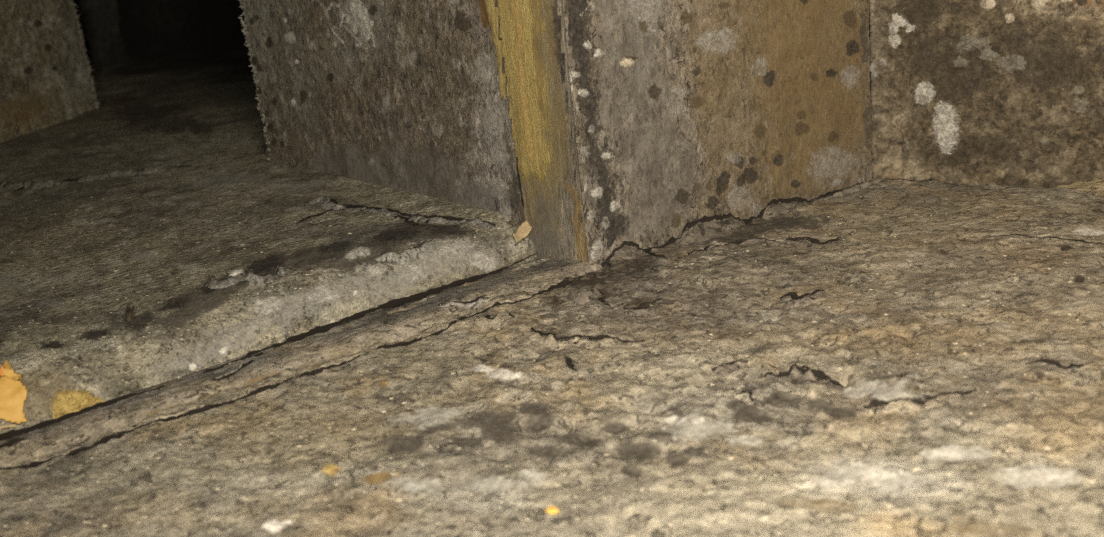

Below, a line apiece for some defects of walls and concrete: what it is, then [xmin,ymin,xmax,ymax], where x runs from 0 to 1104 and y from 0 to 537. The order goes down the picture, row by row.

water stain [698,29,734,53]
water stain [648,85,703,108]
water stain [753,58,775,87]
water stain [811,0,1104,184]
water stain [552,0,629,248]
crack [0,165,191,193]
water stain [674,155,758,227]
water stain [698,213,830,247]
water stain [569,258,651,300]
crack [0,178,938,470]